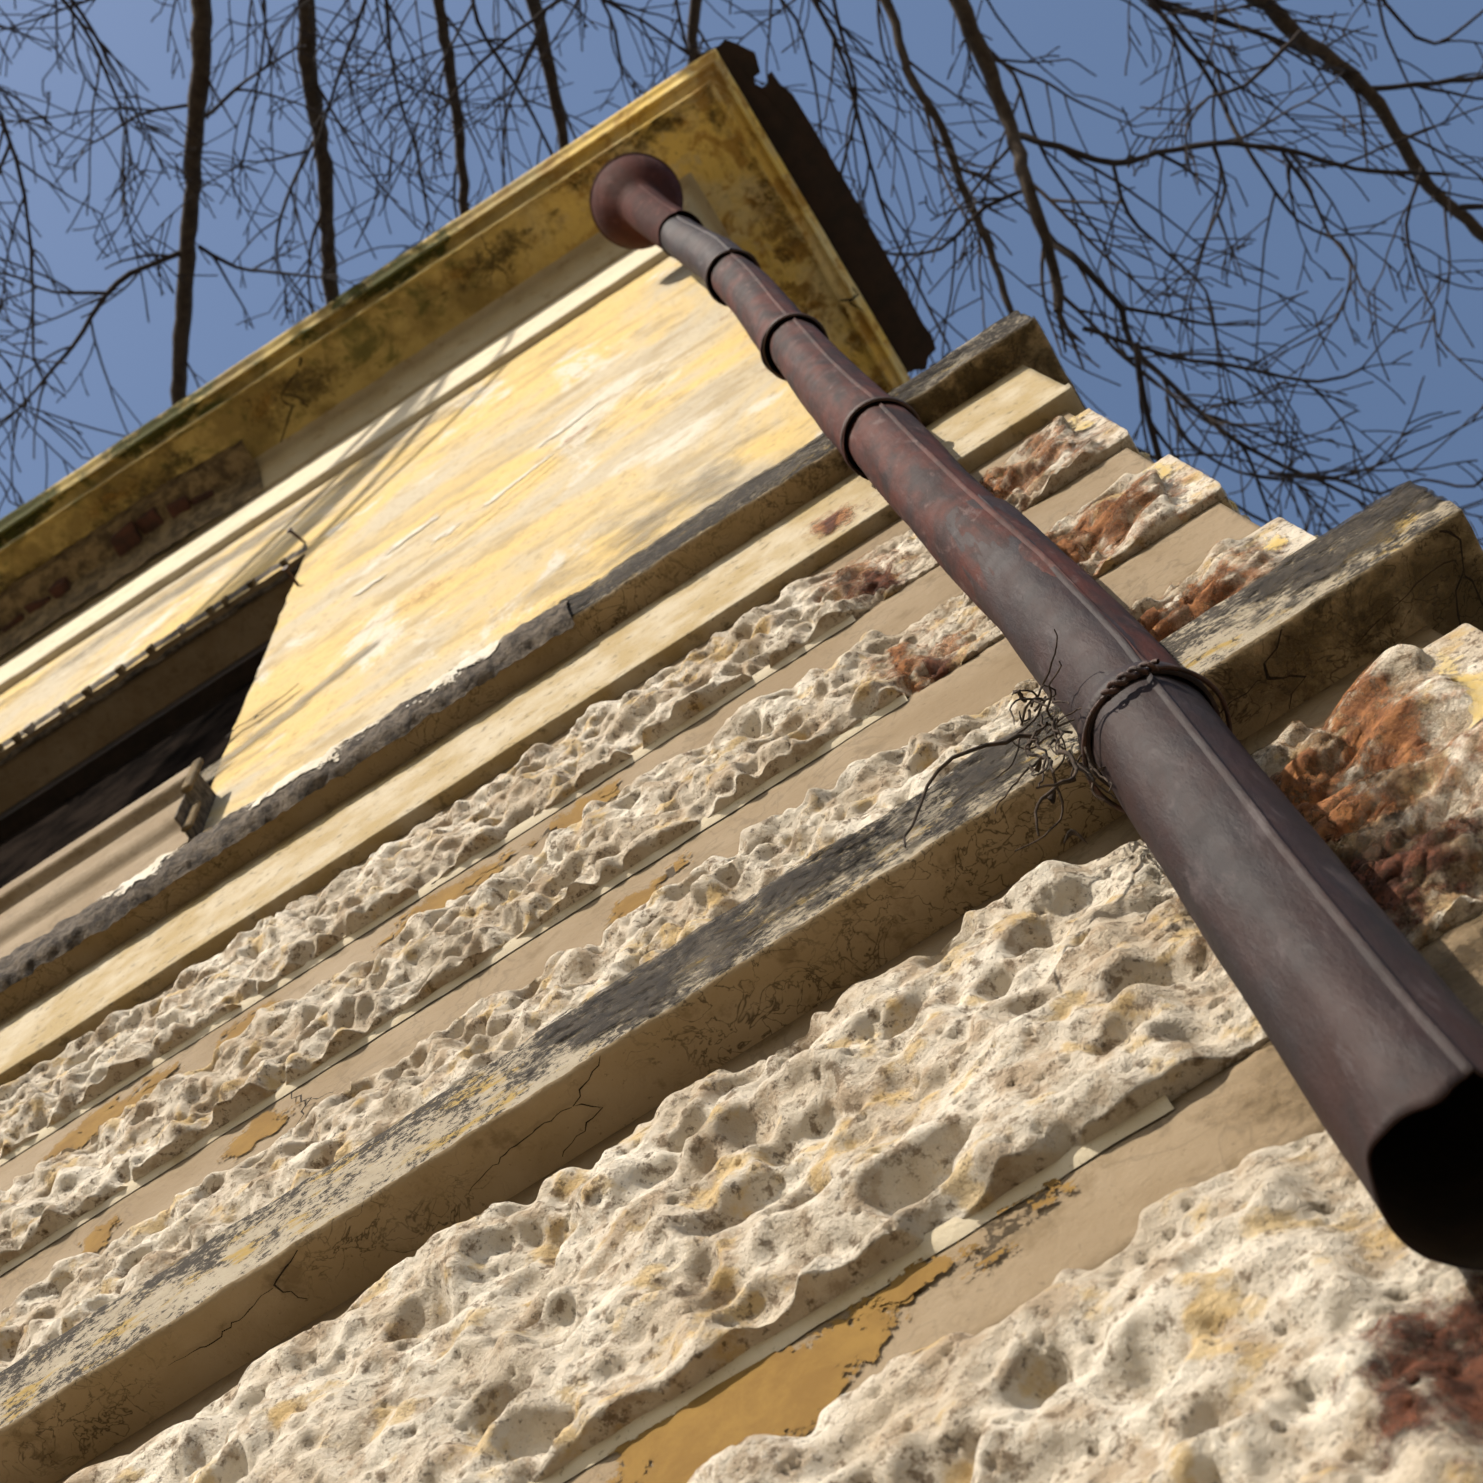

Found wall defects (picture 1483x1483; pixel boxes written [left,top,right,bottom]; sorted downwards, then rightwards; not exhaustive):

damp [559,433,847,616]
corrosion [1046,470,1189,577]
corrosion [1133,543,1272,642]
crack [1356,530,1483,645]
spalling [0,600,575,992]
damp [201,641,377,780]
peeling [371,778,621,951]
peeling [603,850,694,931]
damp [493,705,1077,1091]
corrosion [1270,662,1483,934]
crack [468,1058,603,1194]
corrosion [1354,1274,1483,1470]